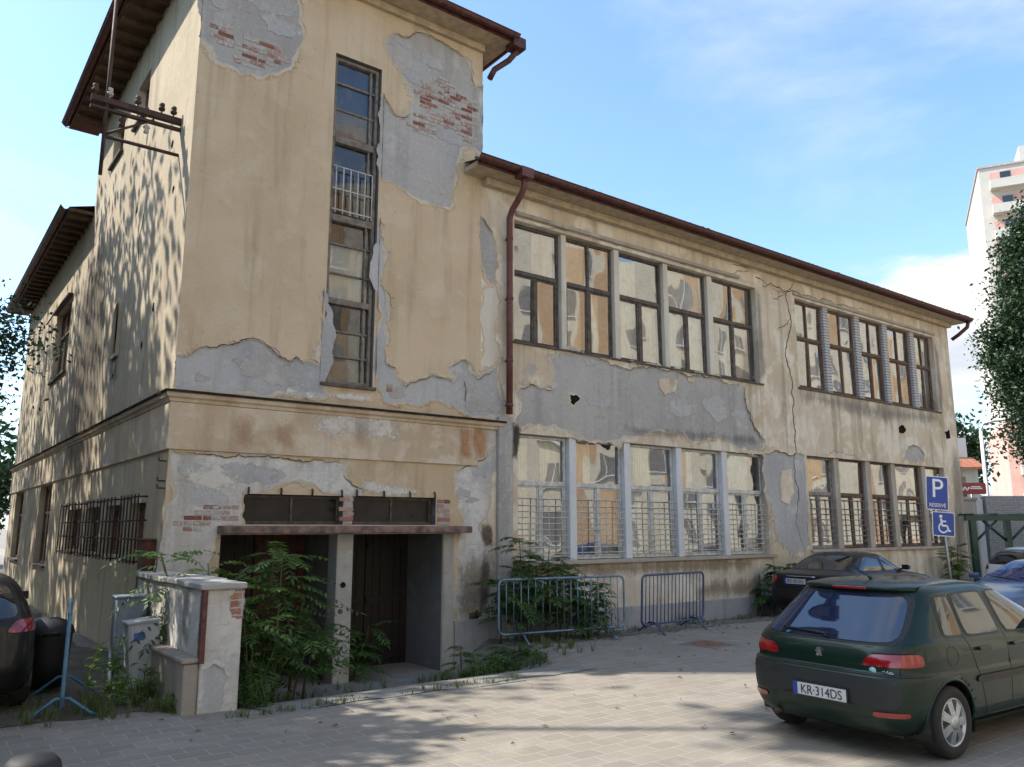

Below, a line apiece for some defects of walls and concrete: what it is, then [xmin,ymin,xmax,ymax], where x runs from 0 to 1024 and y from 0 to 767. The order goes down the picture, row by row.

spalling [197,0,309,82]
spalling [377,27,483,213]
spalling [156,212,811,626]
crack [763,281,871,547]
spalling [897,424,925,463]
spalling [197,659,230,713]